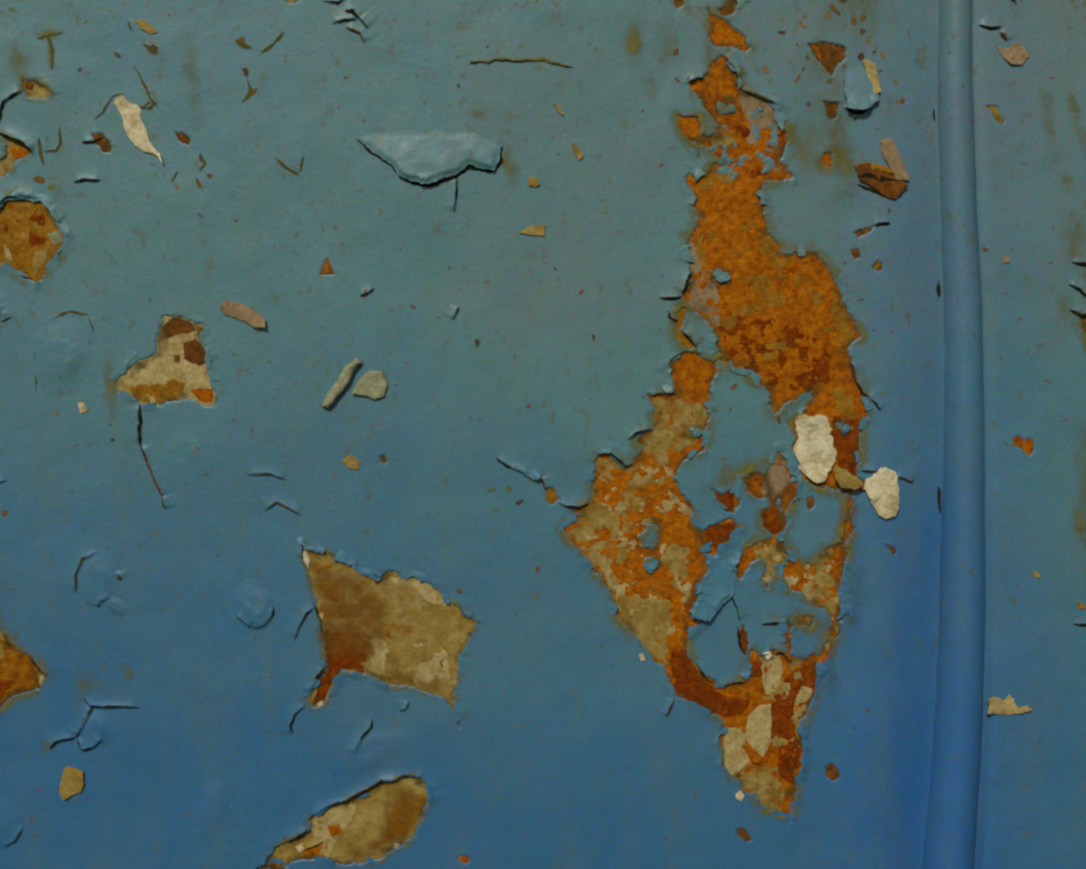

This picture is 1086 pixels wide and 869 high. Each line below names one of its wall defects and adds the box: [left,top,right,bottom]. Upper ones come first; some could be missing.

rust [628,31,640,53]
rust [824,0,885,72]
peeling [854,138,910,199]
peeling [106,306,223,411]
peeling [219,300,265,328]
crack [137,404,165,509]
peeling [546,488,559,504]
peeling [554,0,900,827]
peeling [294,536,477,731]
peeling [264,766,444,869]